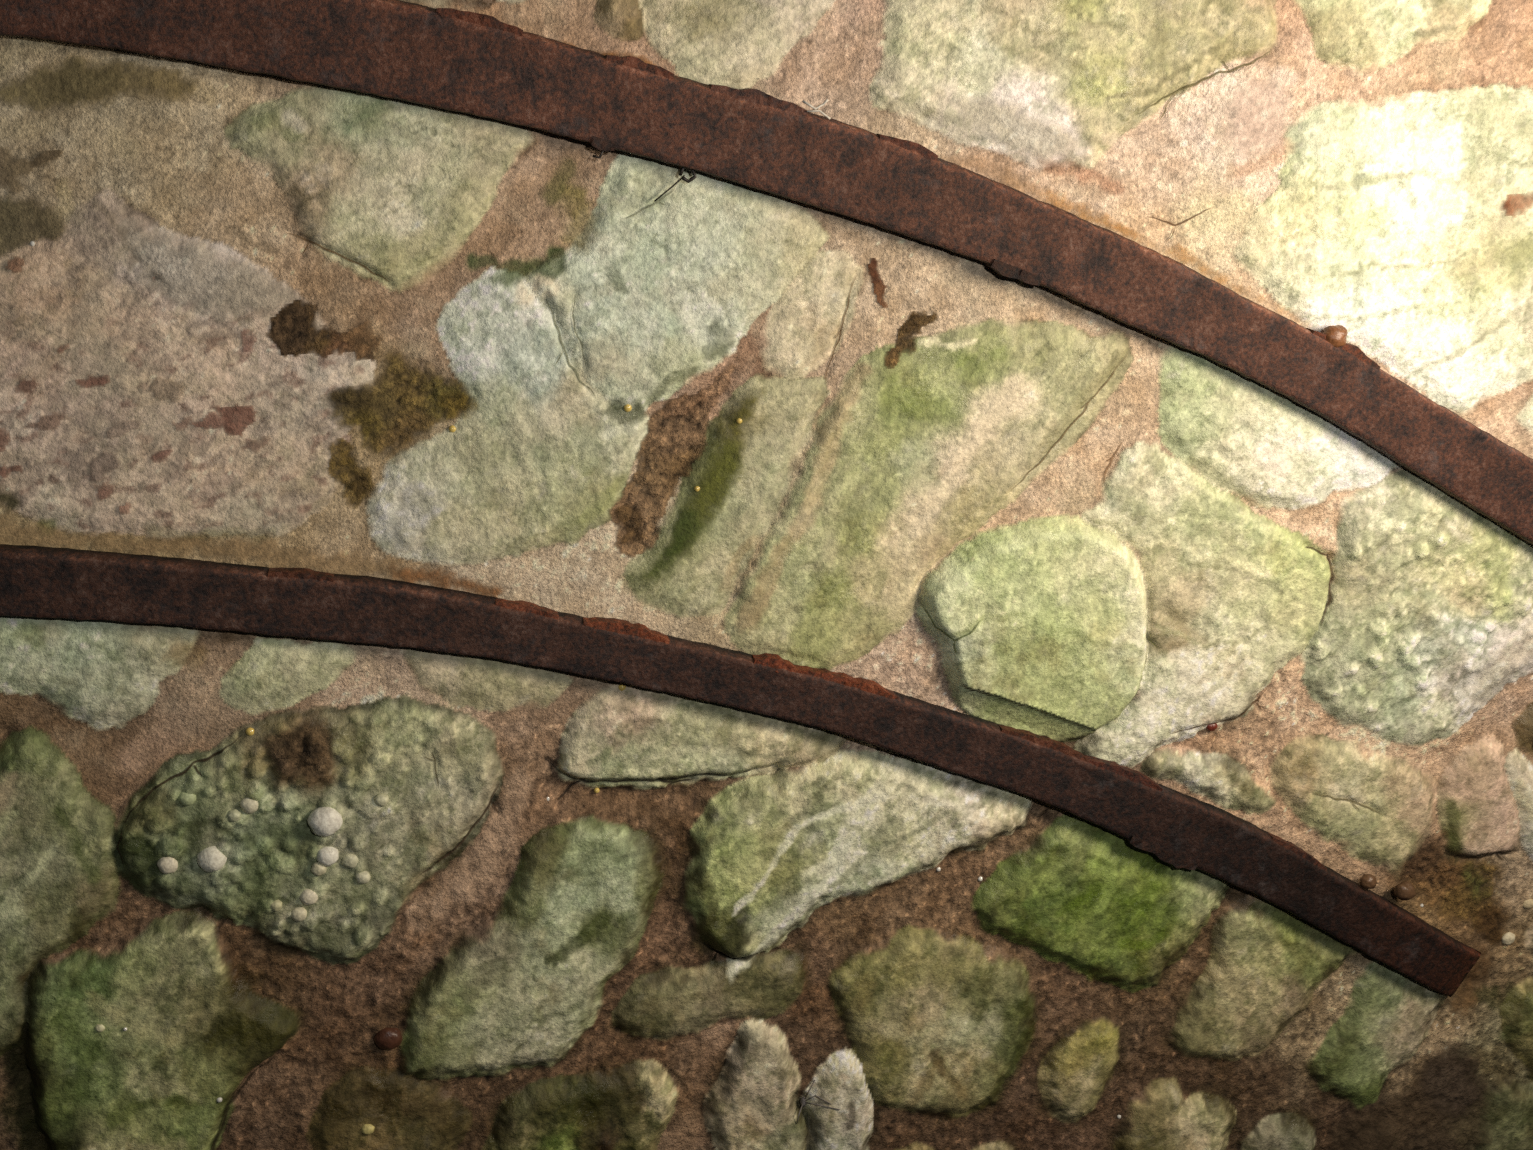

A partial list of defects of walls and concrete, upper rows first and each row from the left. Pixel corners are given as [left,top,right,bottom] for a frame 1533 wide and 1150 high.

corrosion [436,8,523,36]
corrosion [605,55,674,79]
corrosion [708,84,808,116]
corrosion [877,134,938,161]
corrosion [1505,194,1533,216]
corrosion [868,258,888,308]
corrosion [1306,325,1380,370]
corrosion [0,517,559,619]
corrosion [582,617,670,644]
corrosion [752,653,899,699]
corrosion [999,725,1163,792]
corrosion [1268,833,1327,871]